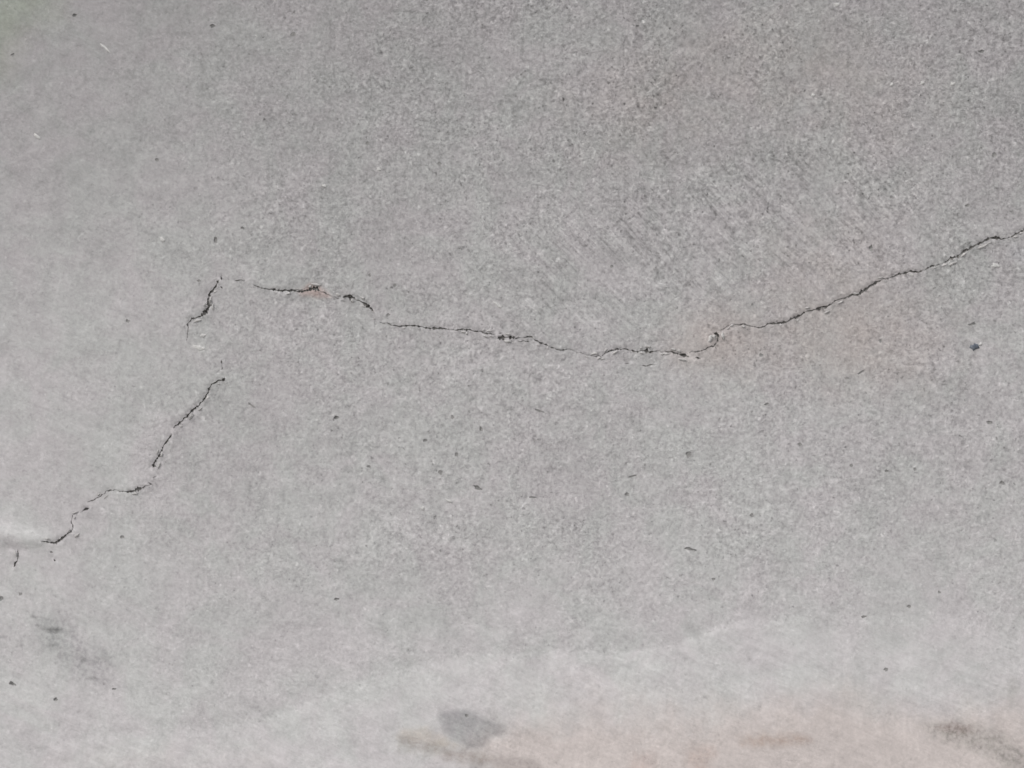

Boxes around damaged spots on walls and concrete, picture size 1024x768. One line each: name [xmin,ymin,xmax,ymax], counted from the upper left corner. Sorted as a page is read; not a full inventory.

crack [186,230,1024,366]
crack [41,361,225,561]